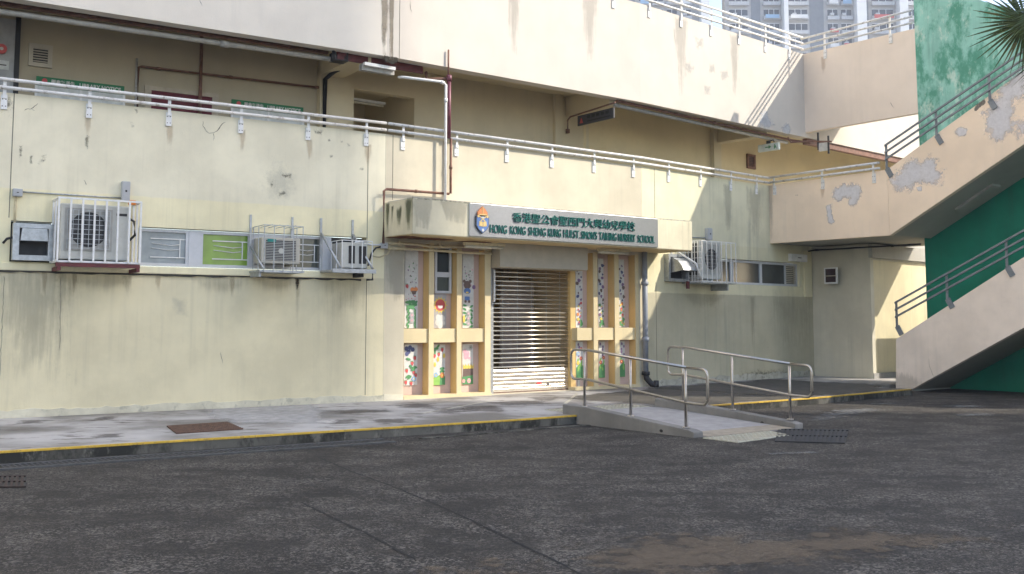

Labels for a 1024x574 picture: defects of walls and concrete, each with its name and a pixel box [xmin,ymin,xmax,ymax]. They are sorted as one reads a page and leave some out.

damp [382,0,394,54]
peeling [974,71,1024,142]
peeling [890,158,943,192]
peeling [826,183,862,223]